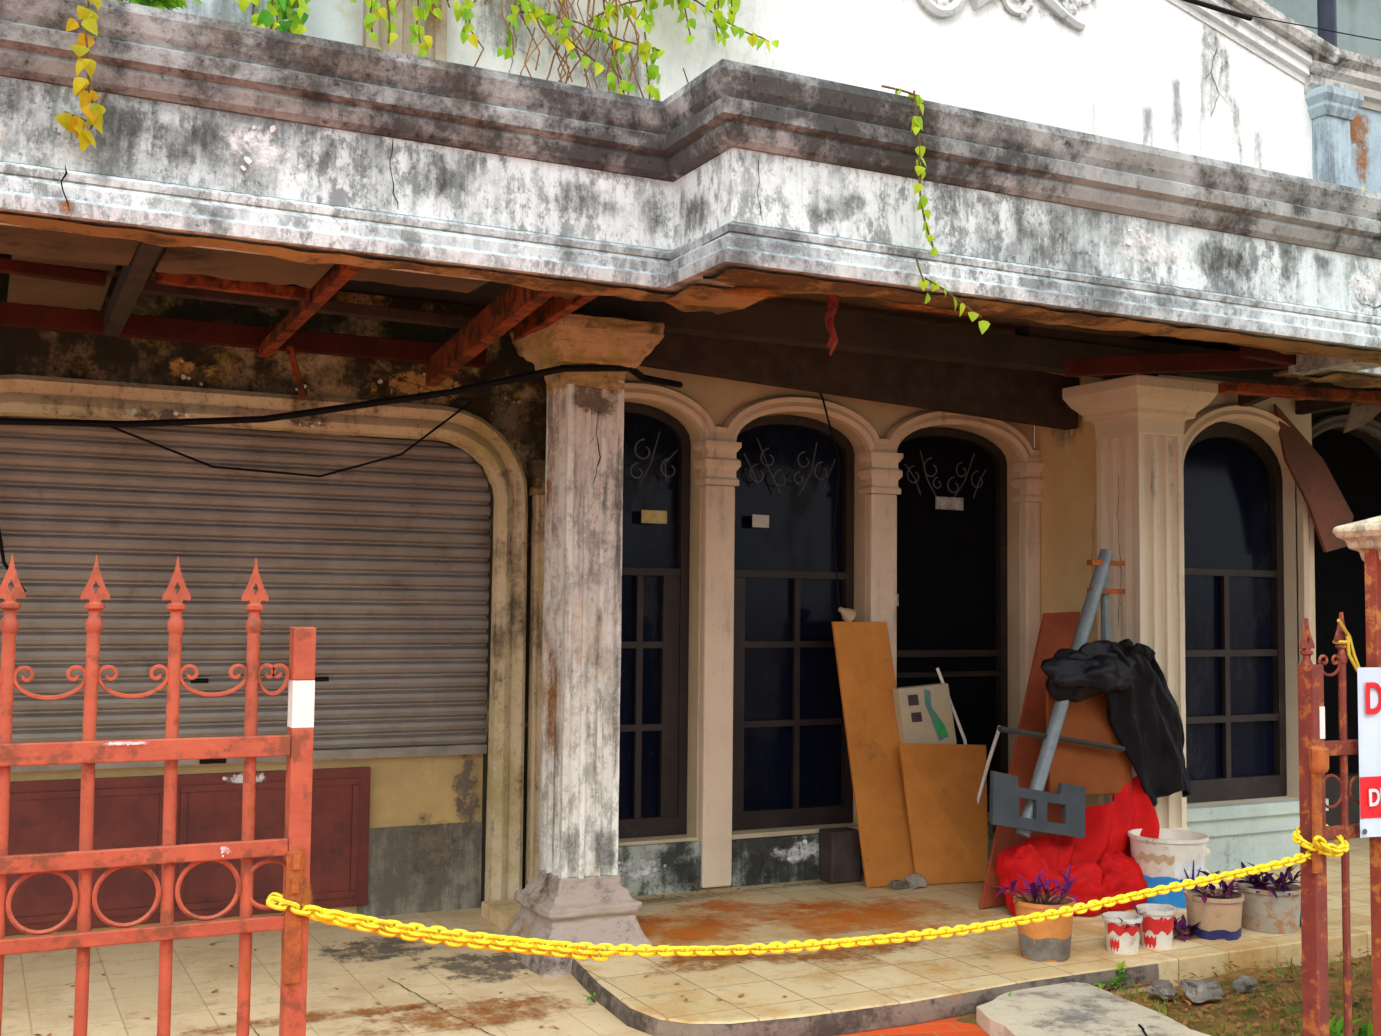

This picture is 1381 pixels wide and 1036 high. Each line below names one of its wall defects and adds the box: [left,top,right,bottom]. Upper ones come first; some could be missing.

damp [489,0,523,46]
damp [544,1,641,92]
damp [1173,81,1181,141]
corrosion [1350,114,1368,180]
damp [1201,244,1243,276]
damp [413,754,480,884]
damp [595,833,614,869]
corrosion [638,899,945,971]